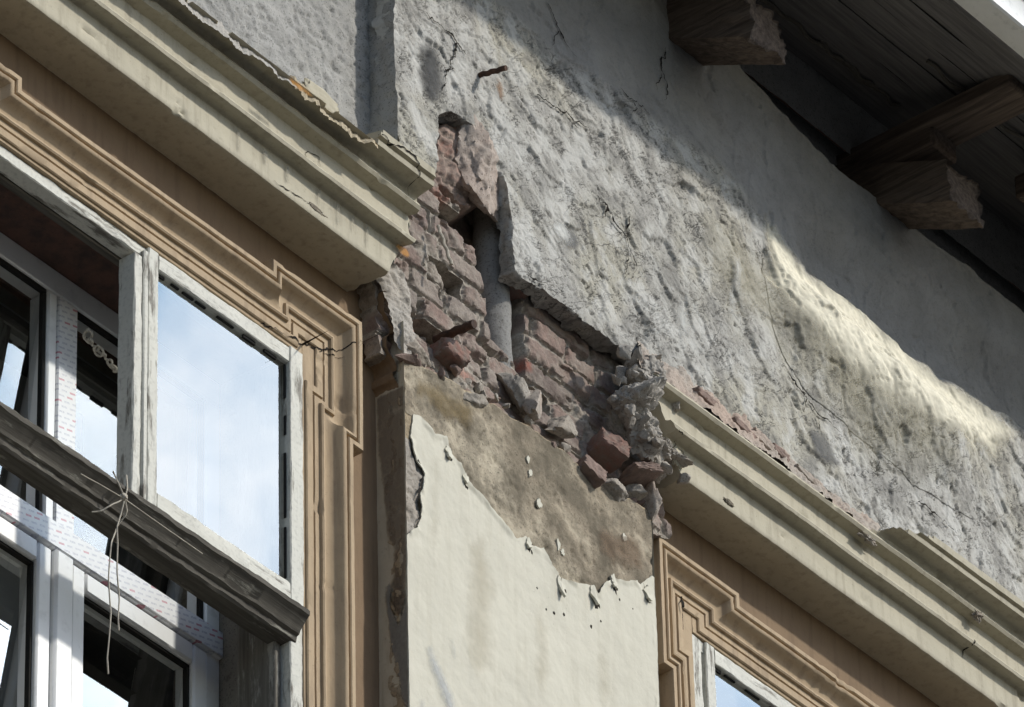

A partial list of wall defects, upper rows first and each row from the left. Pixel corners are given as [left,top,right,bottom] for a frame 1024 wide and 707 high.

peeling [301,78,340,114]
crack [427,13,466,107]
crack [621,49,668,115]
crack [261,322,379,358]
spalling [357,114,693,629]
crack [789,373,838,430]